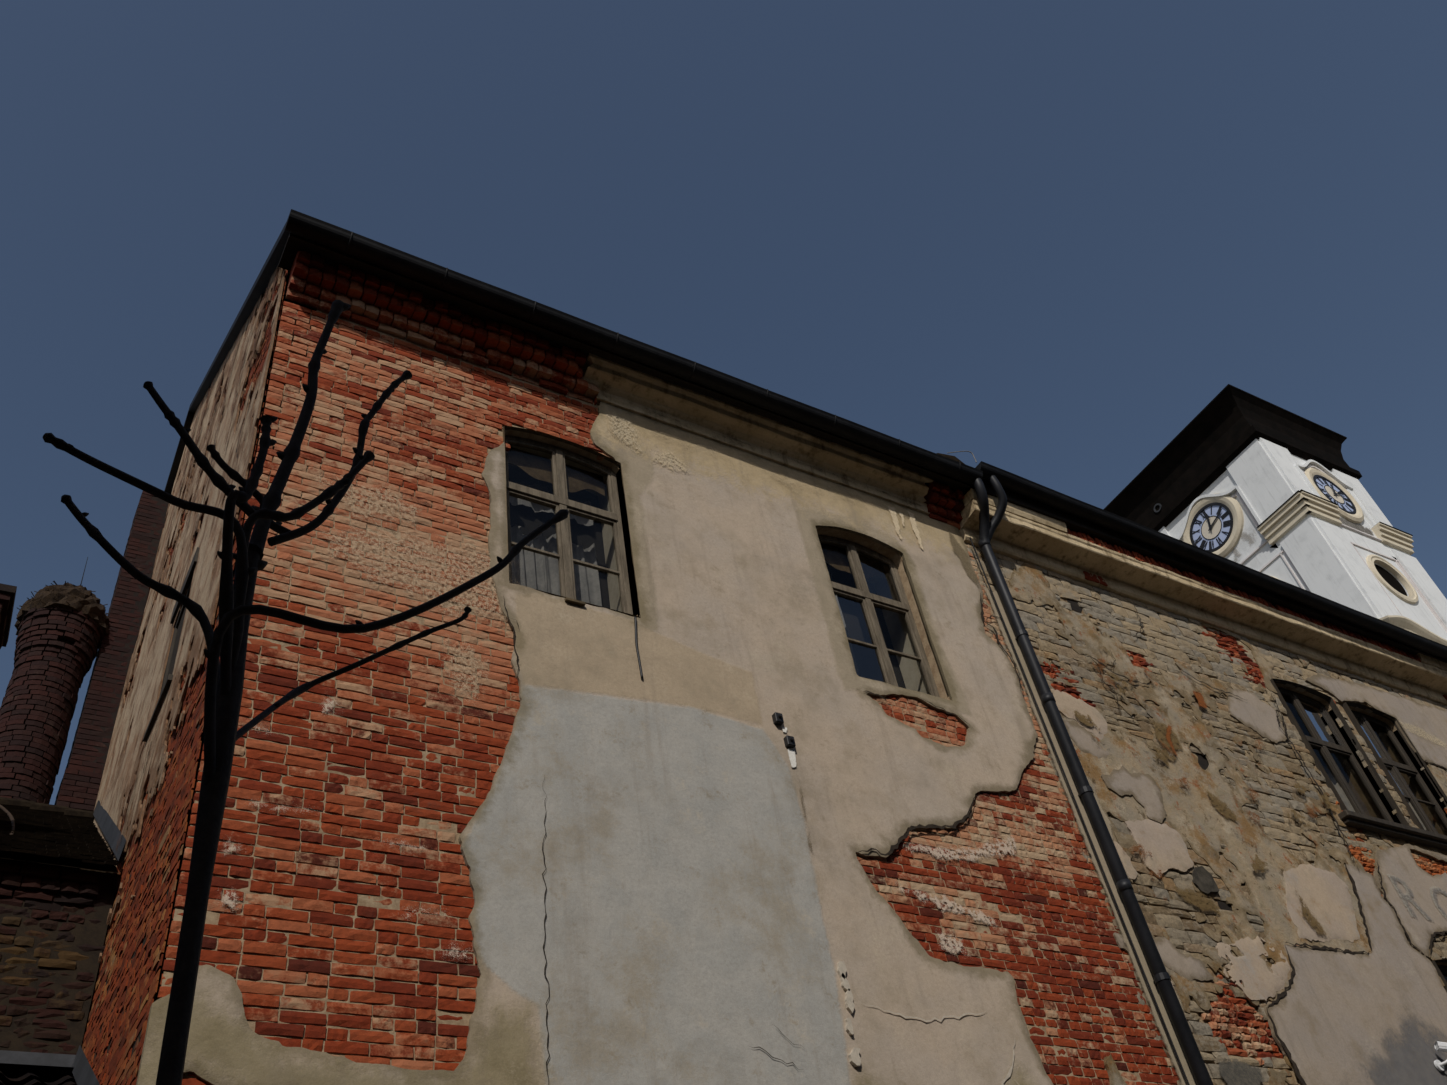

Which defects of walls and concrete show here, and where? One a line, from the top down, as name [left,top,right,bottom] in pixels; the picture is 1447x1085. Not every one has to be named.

flaking render [79,266,694,1085]
flaking render [1201,626,1289,744]
crack [542,777,550,1085]
flaking render [856,544,1180,1085]
flaking render [1041,661,1232,911]
flaking render [1283,864,1360,943]
flaking render [1335,801,1375,877]
flaking render [1411,853,1447,876]
flaking render [1154,936,1290,1065]